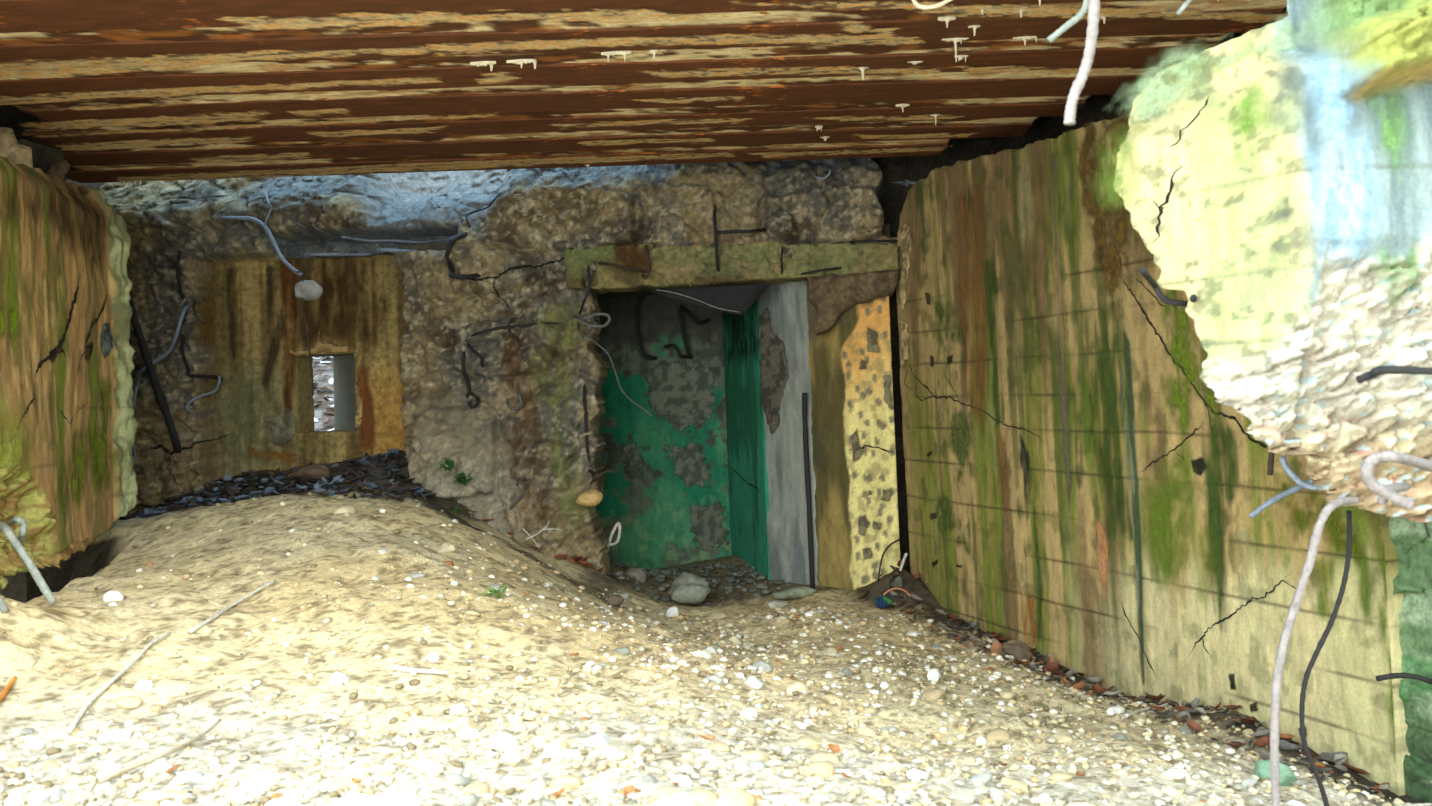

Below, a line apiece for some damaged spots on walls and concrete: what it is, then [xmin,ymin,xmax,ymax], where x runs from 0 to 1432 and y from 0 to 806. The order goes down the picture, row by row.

leakage [1079,117,1129,307]
crack [1152,95,1210,243]
crack [10,277,107,441]
peeling [461,244,730,553]
peeling [758,307,789,434]
leakage [1104,333,1144,683]
spalling [1139,267,1204,358]
crack [1121,278,1268,472]
leakage [1226,430,1237,500]
spalling [1356,365,1432,384]
crack [1189,571,1296,655]
leakage [1358,553,1370,615]